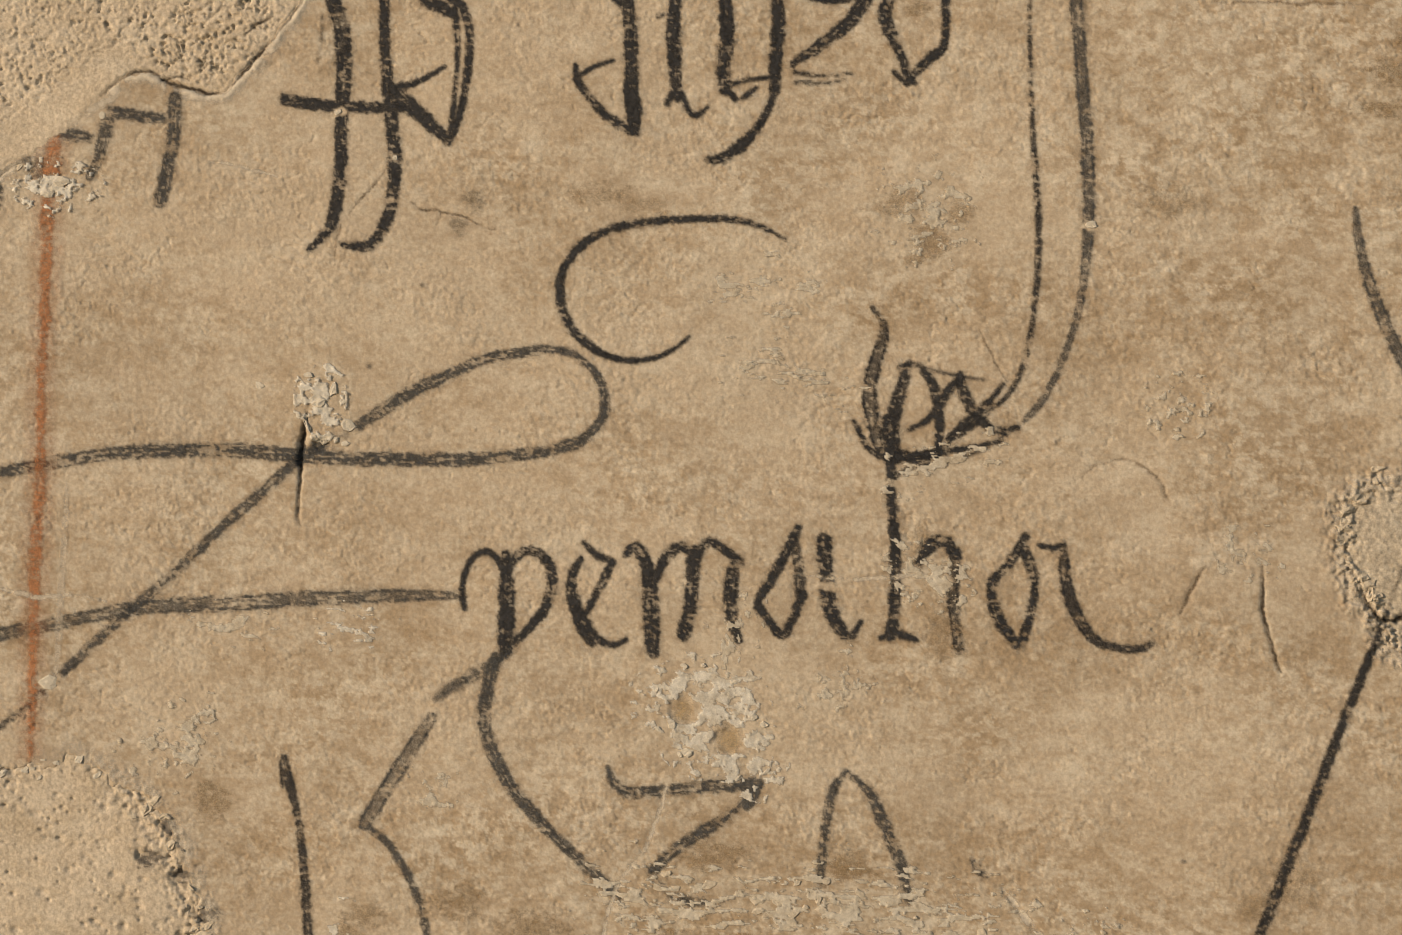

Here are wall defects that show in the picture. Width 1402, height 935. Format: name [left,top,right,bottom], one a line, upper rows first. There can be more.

rust [42,136,62,176]
spalling [0,0,313,183]
rust [25,197,55,758]
peeling [293,363,357,448]
spalling [1332,466,1402,669]
peeling [629,592,790,803]
spalling [0,692,231,935]